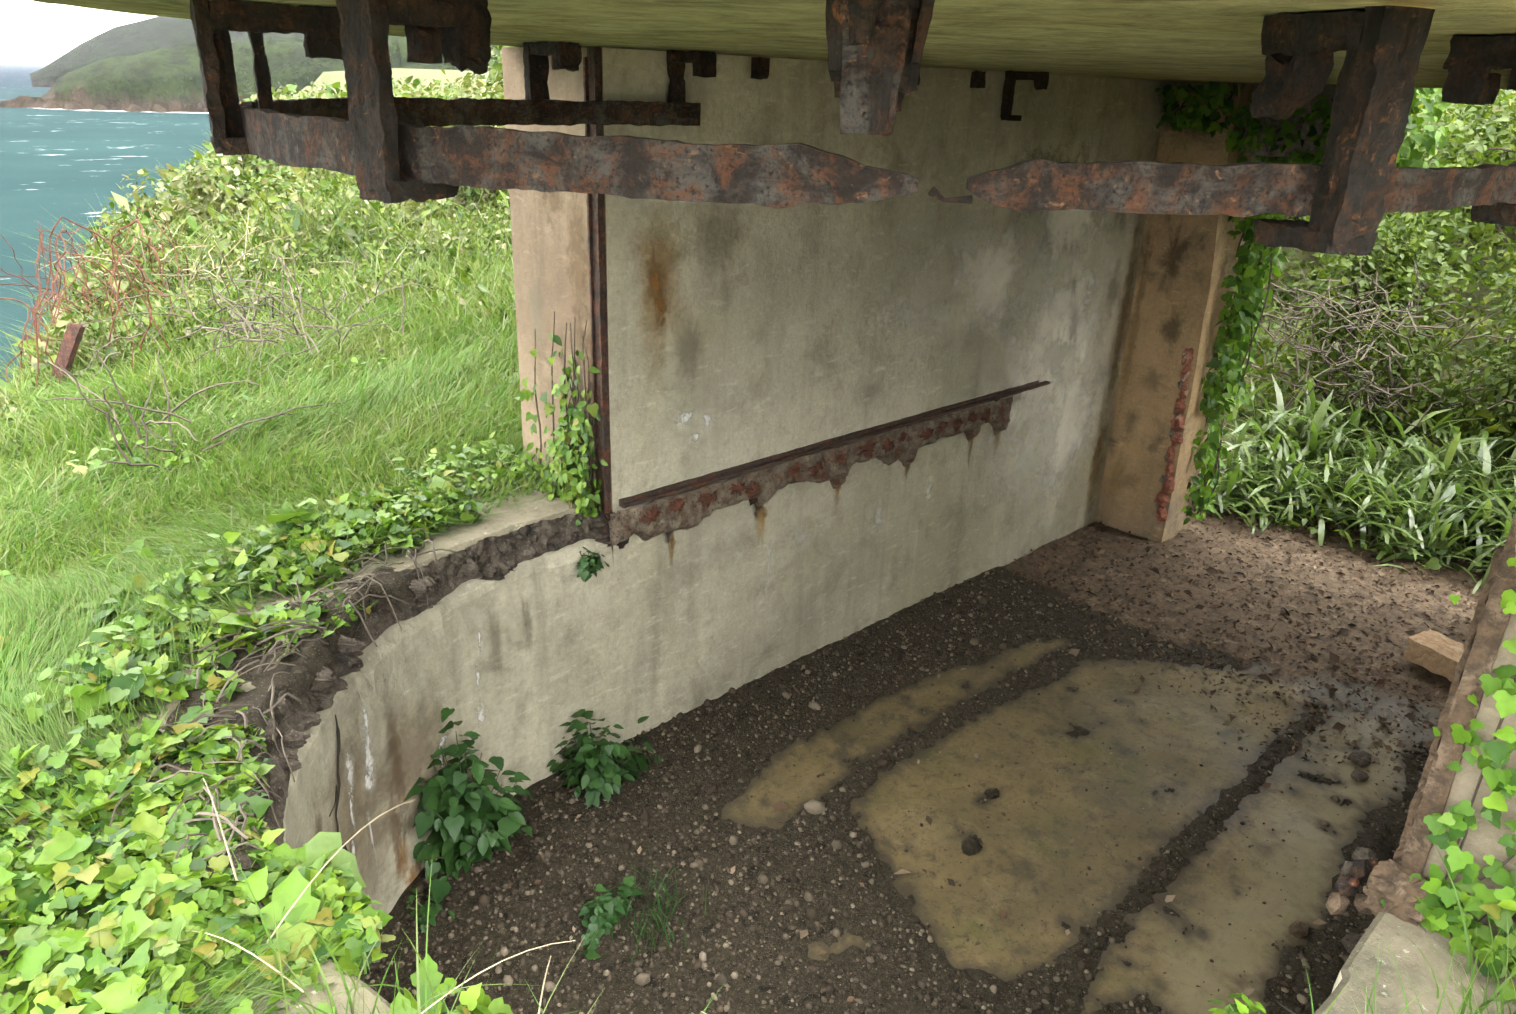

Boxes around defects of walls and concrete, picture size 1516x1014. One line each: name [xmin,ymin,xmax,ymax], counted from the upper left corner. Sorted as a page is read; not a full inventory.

rust [645,236,674,329]
rust [665,532,675,563]
rust [753,504,765,533]
crack [329,715,348,851]
damp [346,708,375,855]